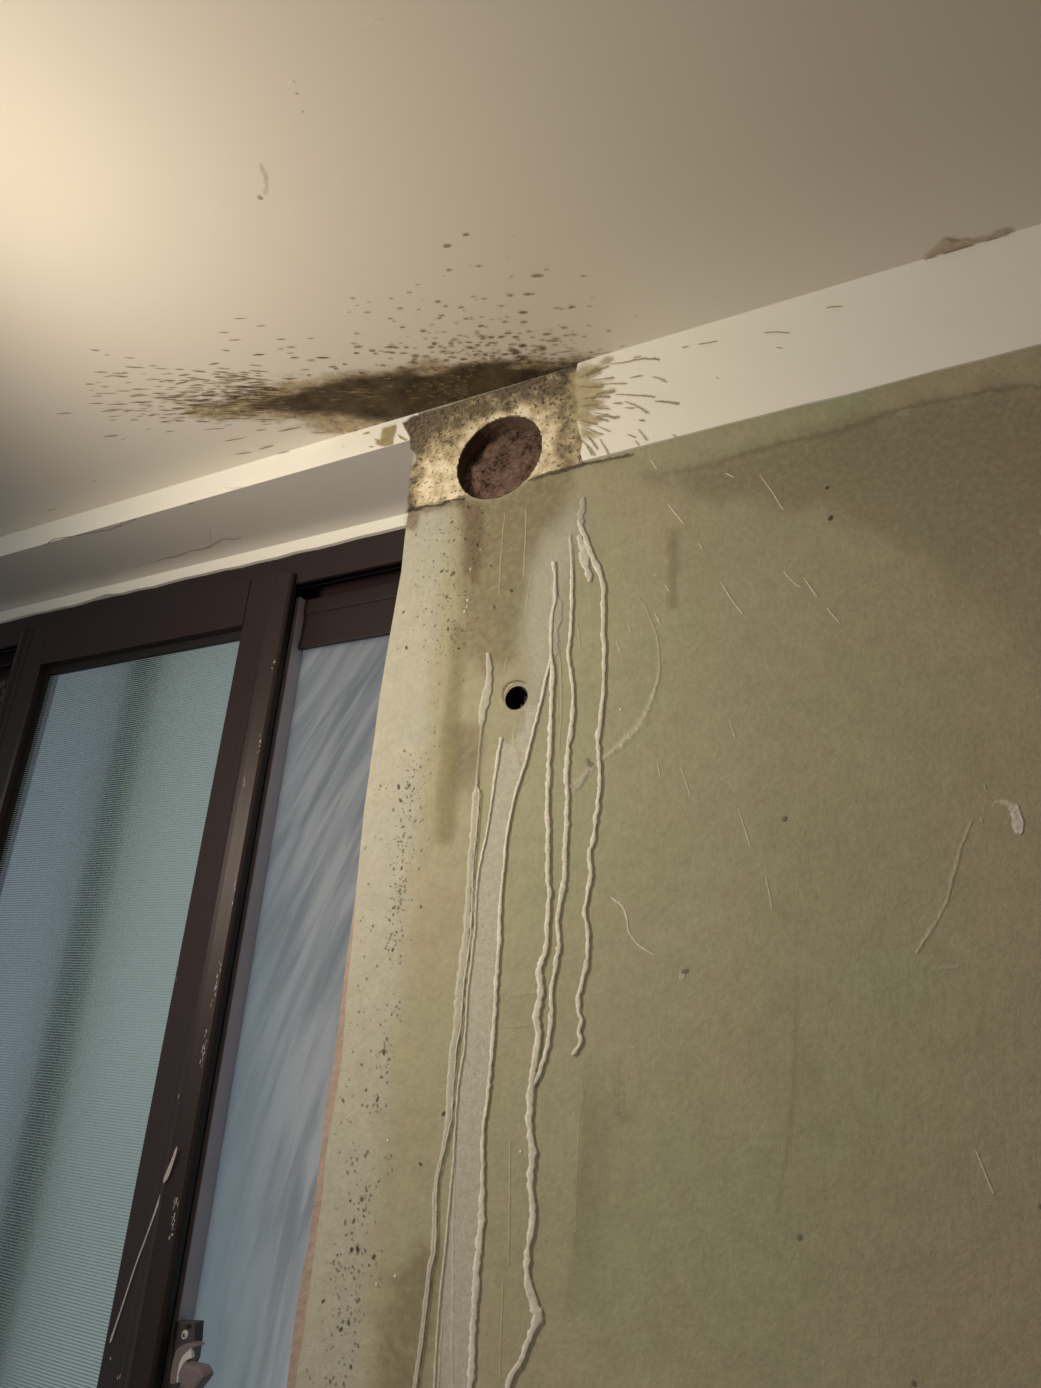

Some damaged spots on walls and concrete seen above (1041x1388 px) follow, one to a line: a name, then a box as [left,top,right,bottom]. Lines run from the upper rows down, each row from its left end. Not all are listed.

peeling [924,229,1010,260]
damp [86,275,679,455]
damp [412,497,607,1388]